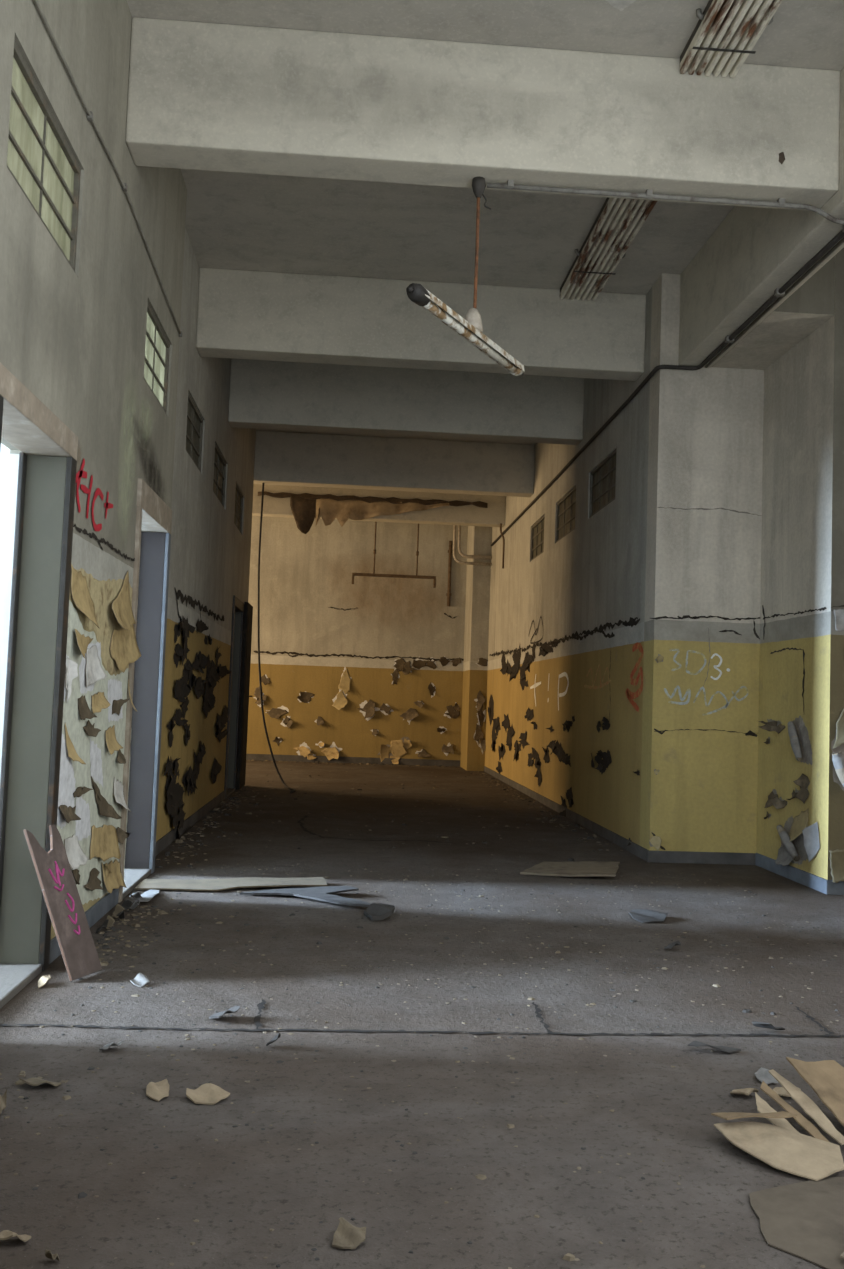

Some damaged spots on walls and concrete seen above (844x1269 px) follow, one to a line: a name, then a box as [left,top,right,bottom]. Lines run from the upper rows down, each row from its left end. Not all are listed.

peeling [57,564,141,905]
peeling [163,615,231,839]
peeling [254,674,342,760]
peeling [332,656,461,764]
peeling [476,639,561,690]
peeling [474,691,575,786]
peeling [559,787,574,817]
peeling [591,750,612,774]
peeling [758,647,844,883]